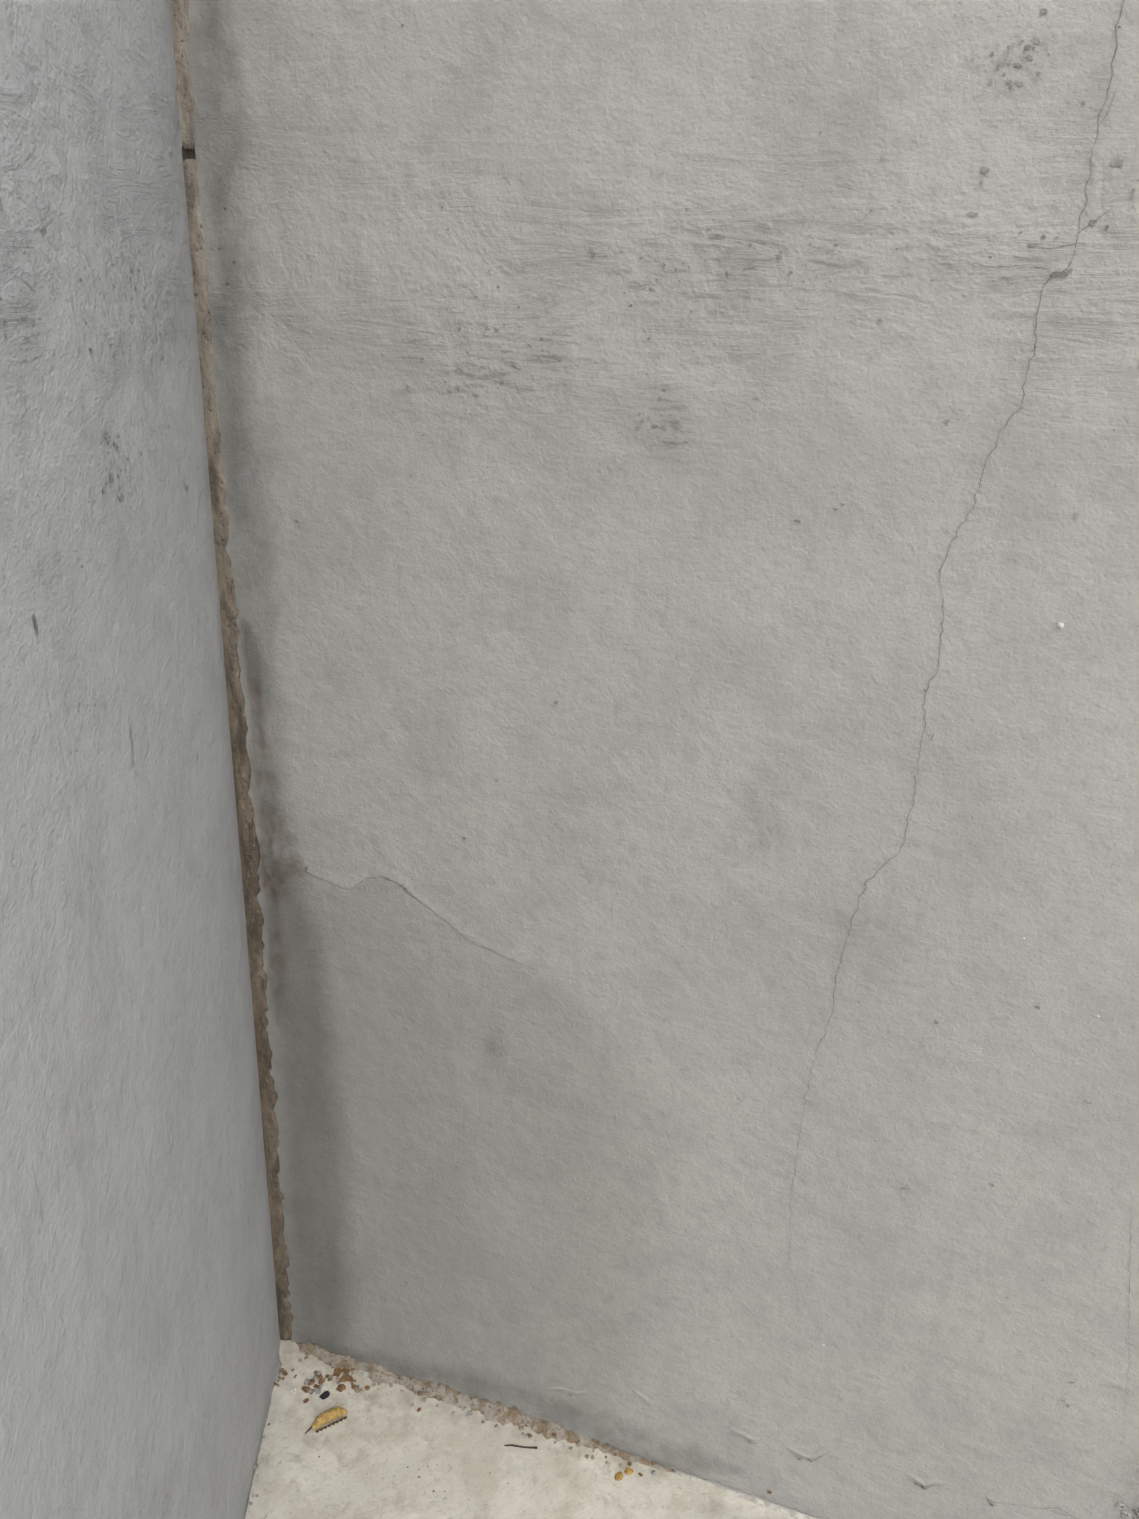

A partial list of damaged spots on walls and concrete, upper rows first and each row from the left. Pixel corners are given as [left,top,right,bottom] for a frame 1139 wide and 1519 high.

crack [788,0,1124,1309]